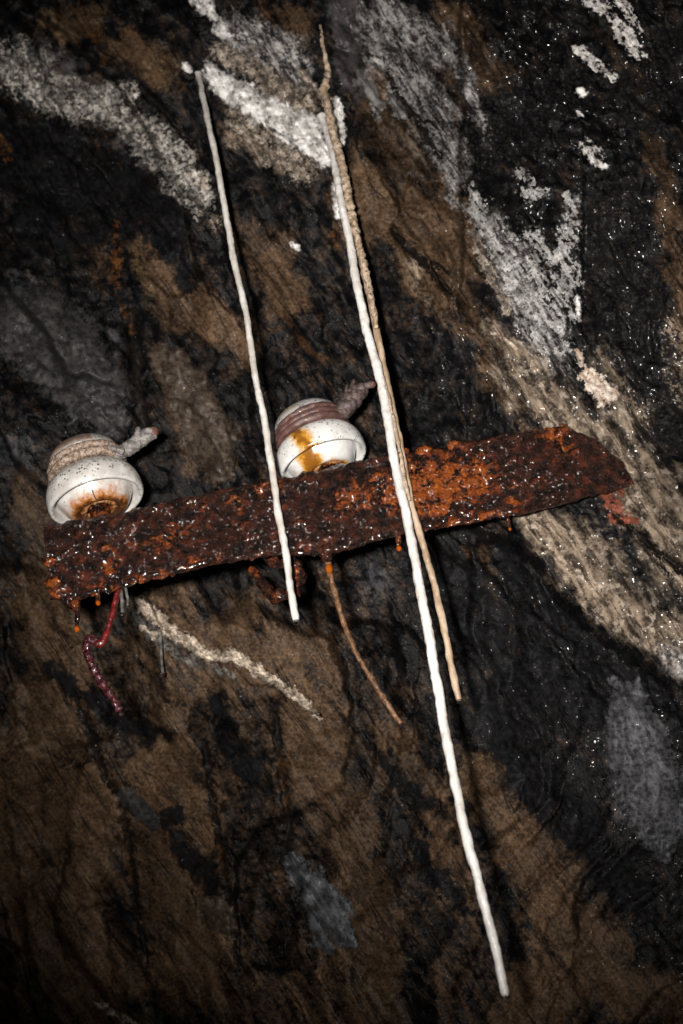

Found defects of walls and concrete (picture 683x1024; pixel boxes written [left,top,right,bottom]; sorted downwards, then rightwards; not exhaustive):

water stain [146,0,365,187]
water stain [0,7,224,302]
water stain [331,182,340,220]
water stain [460,0,683,459]
rust [368,471,383,482]
rust [397,445,433,455]
rust [319,490,583,563]
rust [597,488,640,526]
rust [42,557,102,627]
rust [126,548,305,581]